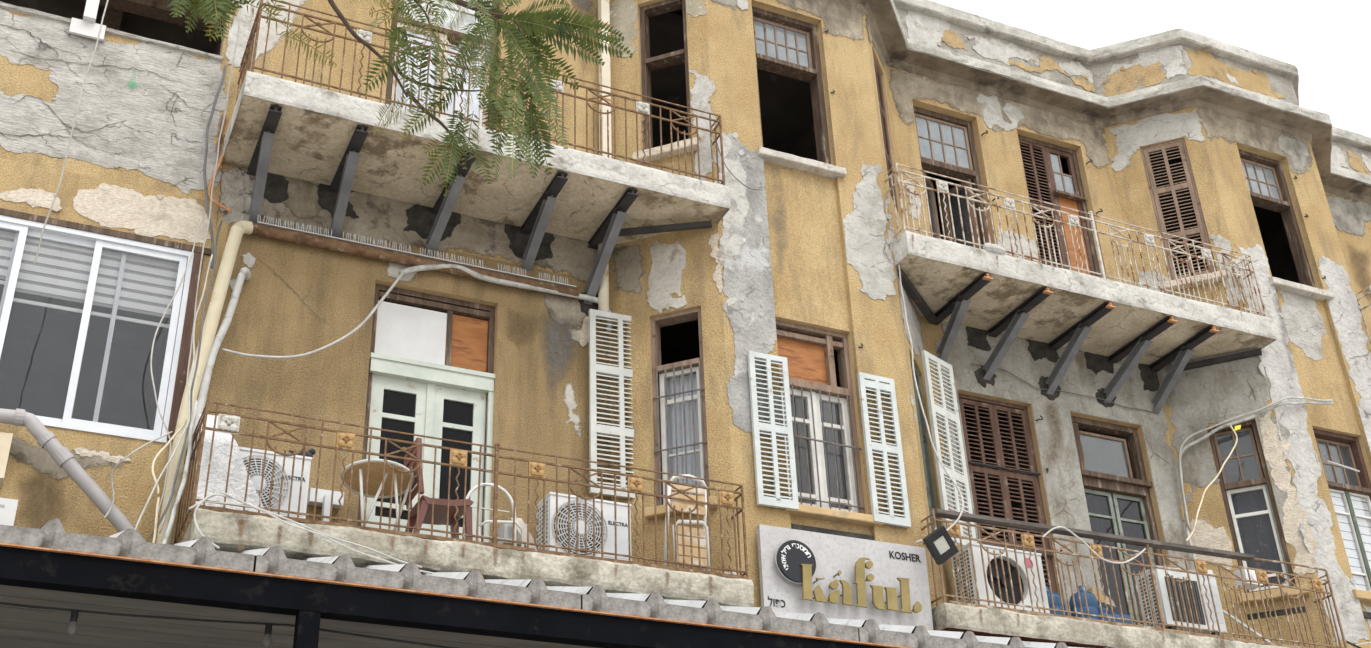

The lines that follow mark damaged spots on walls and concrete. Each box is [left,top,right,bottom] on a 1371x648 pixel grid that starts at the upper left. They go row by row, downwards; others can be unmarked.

crack [0,95,126,149]
crack [0,24,206,126]
flaking render [0,0,687,347]
flaking render [686,0,749,17]
flaking render [689,70,784,440]
flaking render [777,0,1312,174]
peeling [564,384,581,437]
flaking render [842,162,1371,643]